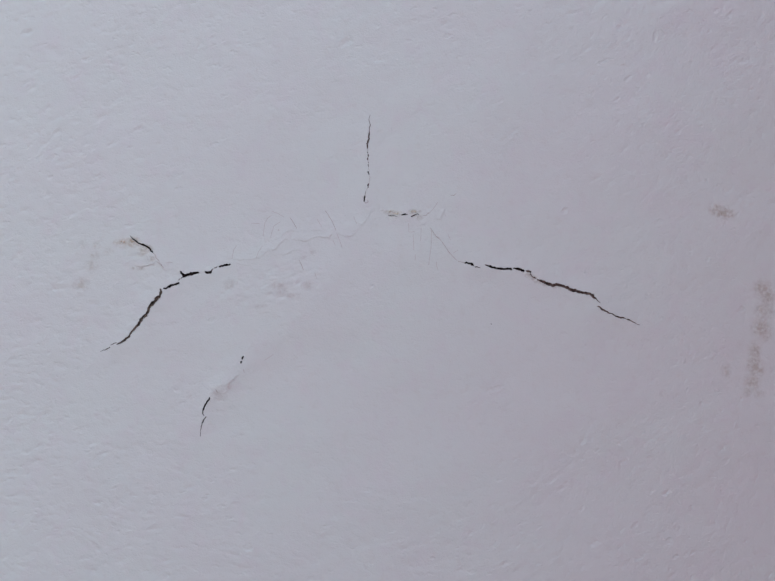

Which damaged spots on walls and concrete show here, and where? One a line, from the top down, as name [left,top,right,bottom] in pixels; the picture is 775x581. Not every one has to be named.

crack [363,116,371,201]
crack [100,264,231,352]
crack [459,261,639,325]